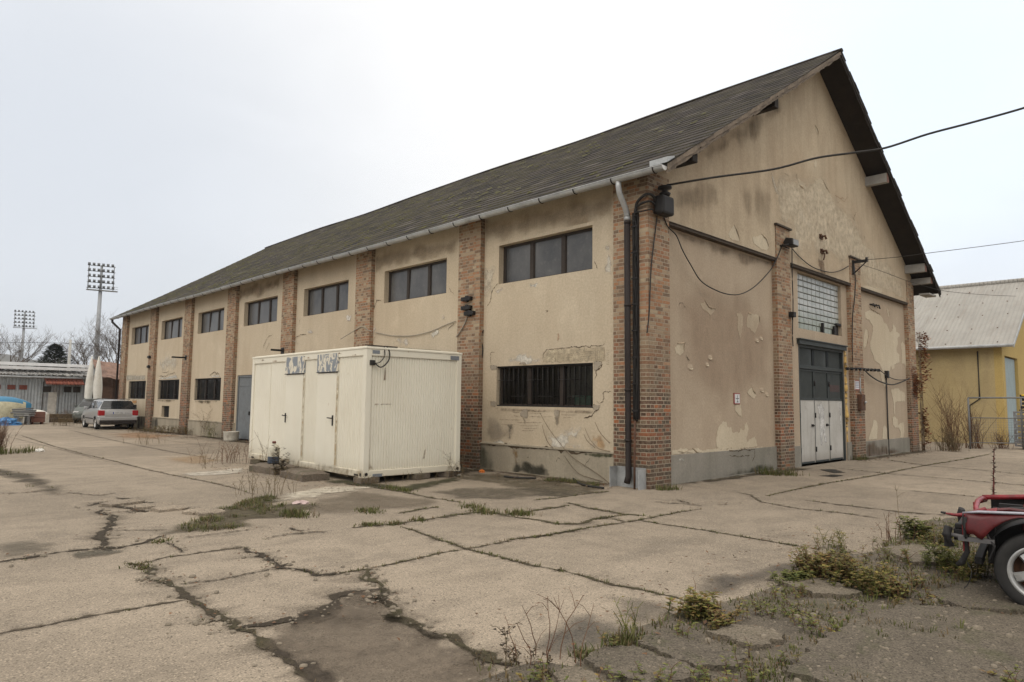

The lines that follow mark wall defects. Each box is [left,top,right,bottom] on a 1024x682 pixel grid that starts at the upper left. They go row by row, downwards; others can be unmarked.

peeling [672,388,763,455]
peeling [863,307,906,440]
crack [0,492,513,679]